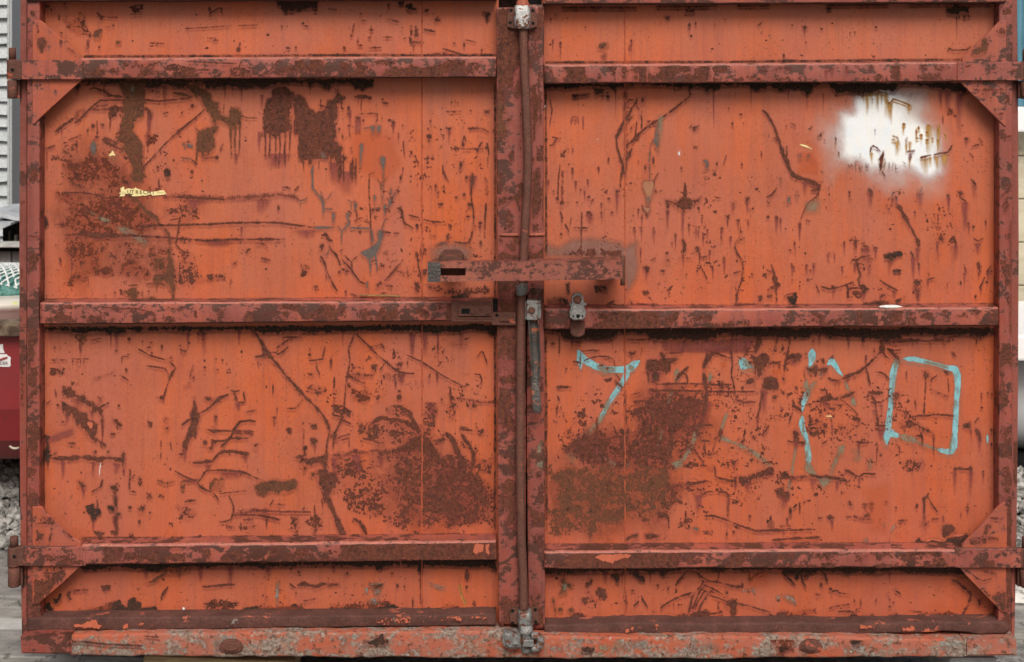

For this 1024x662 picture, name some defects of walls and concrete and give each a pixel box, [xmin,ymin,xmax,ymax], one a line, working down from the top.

rust [20,305,211,564]
rust [51,1,573,610]
rust [528,155,1017,624]
peeling [74,620,101,629]
peeling [902,626,963,650]